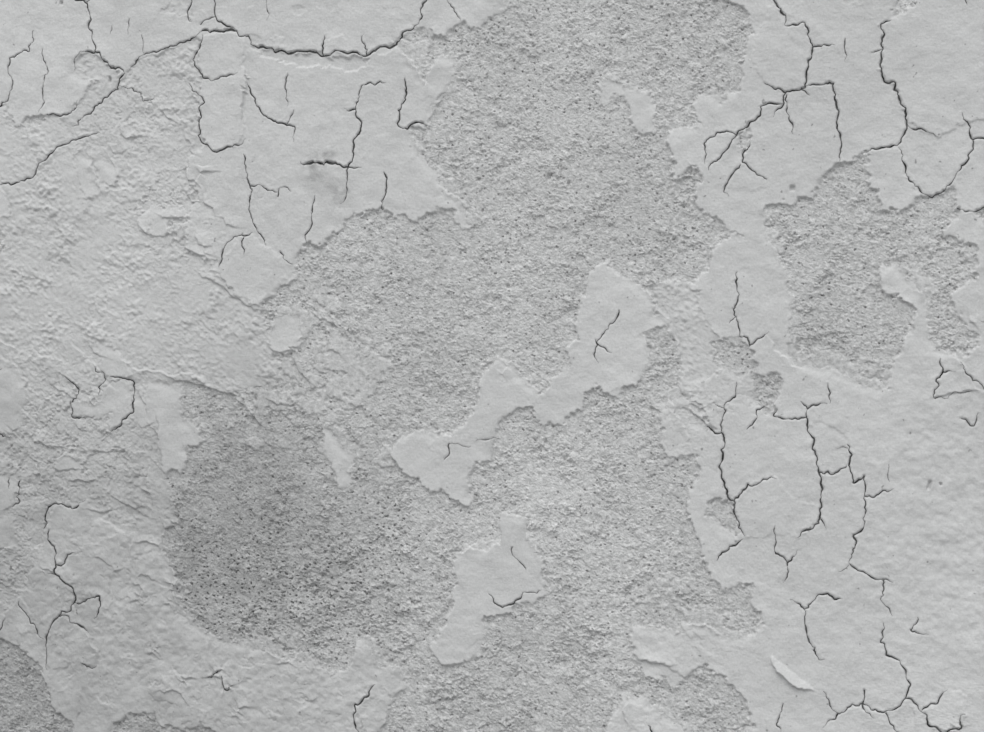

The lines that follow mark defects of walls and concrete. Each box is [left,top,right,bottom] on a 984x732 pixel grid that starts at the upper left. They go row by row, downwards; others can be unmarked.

crack [0,0,461,265]
crack [704,0,847,196]
crack [869,19,984,212]
crack [0,502,101,663]
crack [68,368,135,431]
peeling [0,0,786,732]
crack [488,548,540,608]
crack [707,382,776,560]
crack [729,272,764,346]
crack [747,388,966,732]
peeling [763,151,980,391]
crack [933,358,984,426]